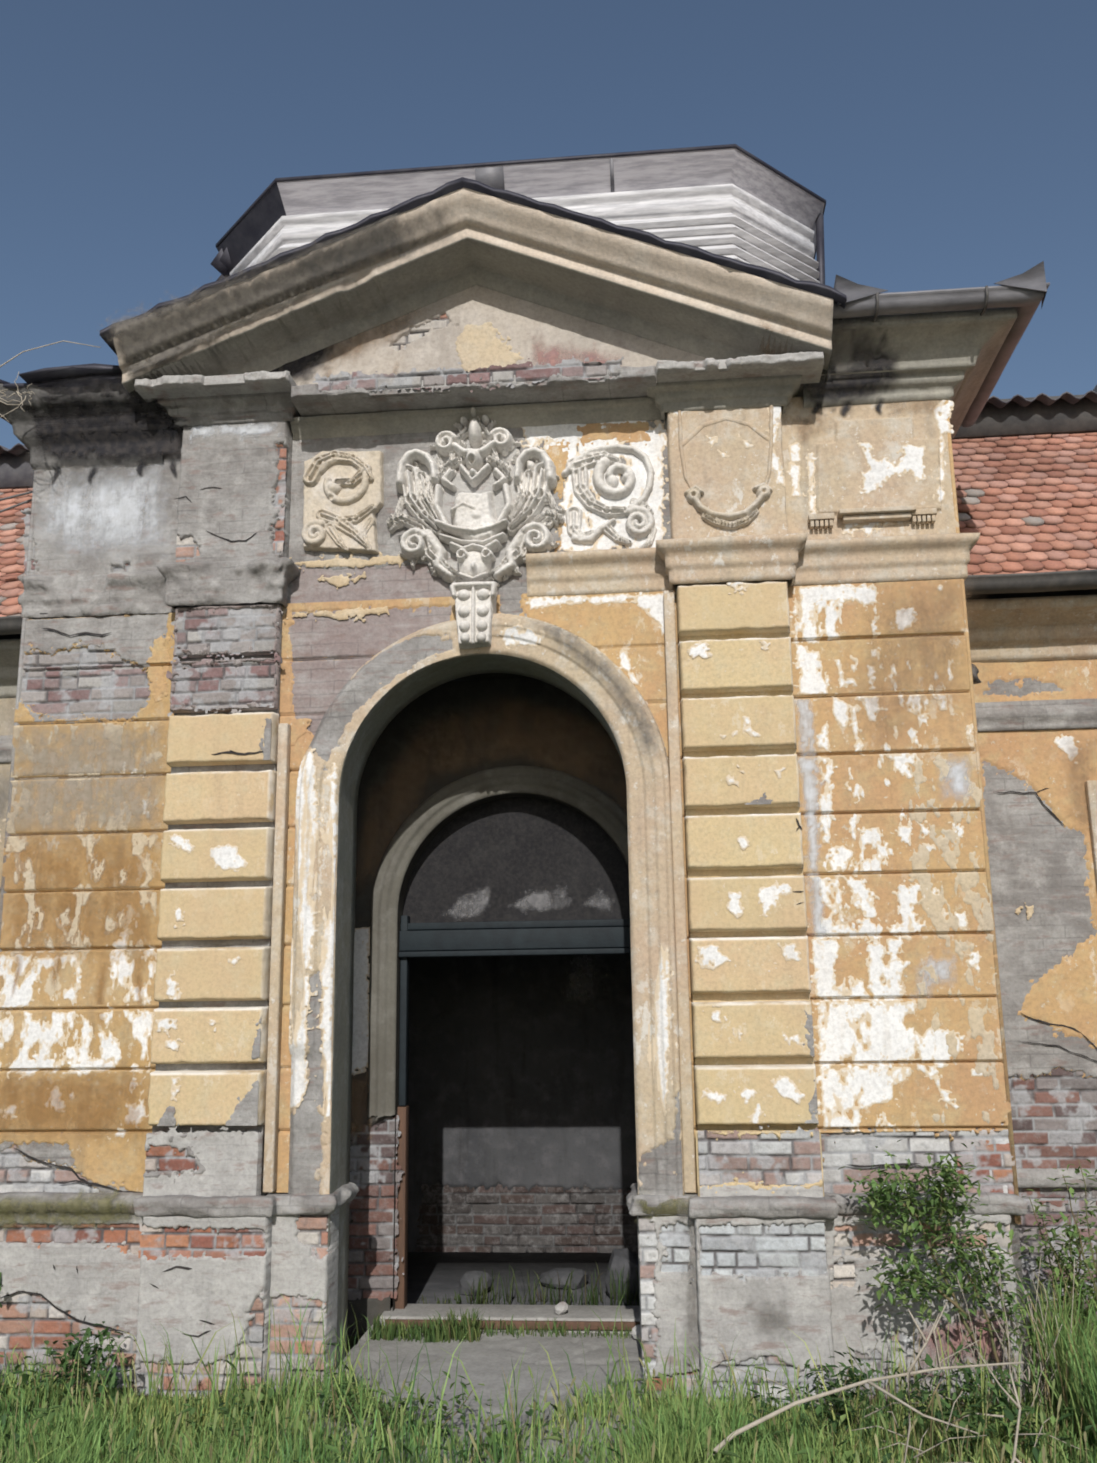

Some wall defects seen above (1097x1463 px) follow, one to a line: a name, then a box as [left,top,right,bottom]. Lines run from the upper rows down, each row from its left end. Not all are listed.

flaking render [390,313,459,351]
flaking render [312,356,624,396]
peeling [852,400,954,512]
peeling [842,522,894,537]
flaking render [0,444,453,1197]
flaking render [348,582,1097,1407]
crack [13,1147,143,1193]
flaking render [0,1222,266,1261]
flaking render [296,1214,328,1259]
crack [1,1265,124,1332]
flaking render [0,1289,326,1398]